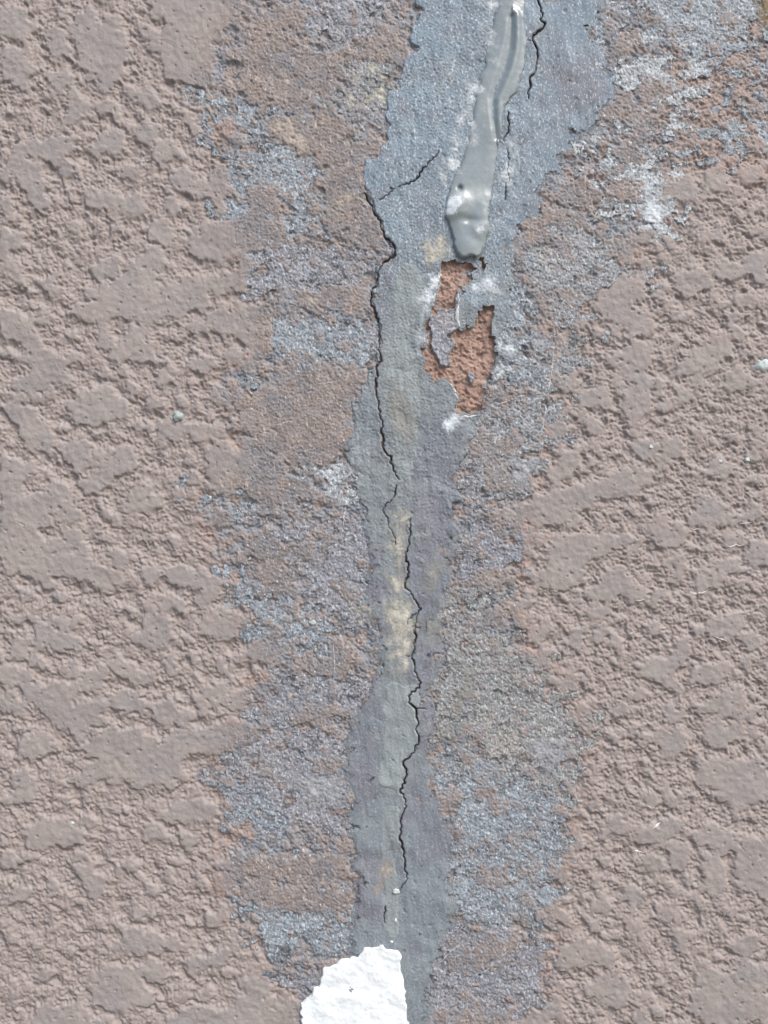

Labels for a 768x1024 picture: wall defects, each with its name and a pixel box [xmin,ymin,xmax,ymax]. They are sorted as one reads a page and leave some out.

crack [503,0,546,199]
spalling [420,256,498,418]
crack [364,153,438,888]